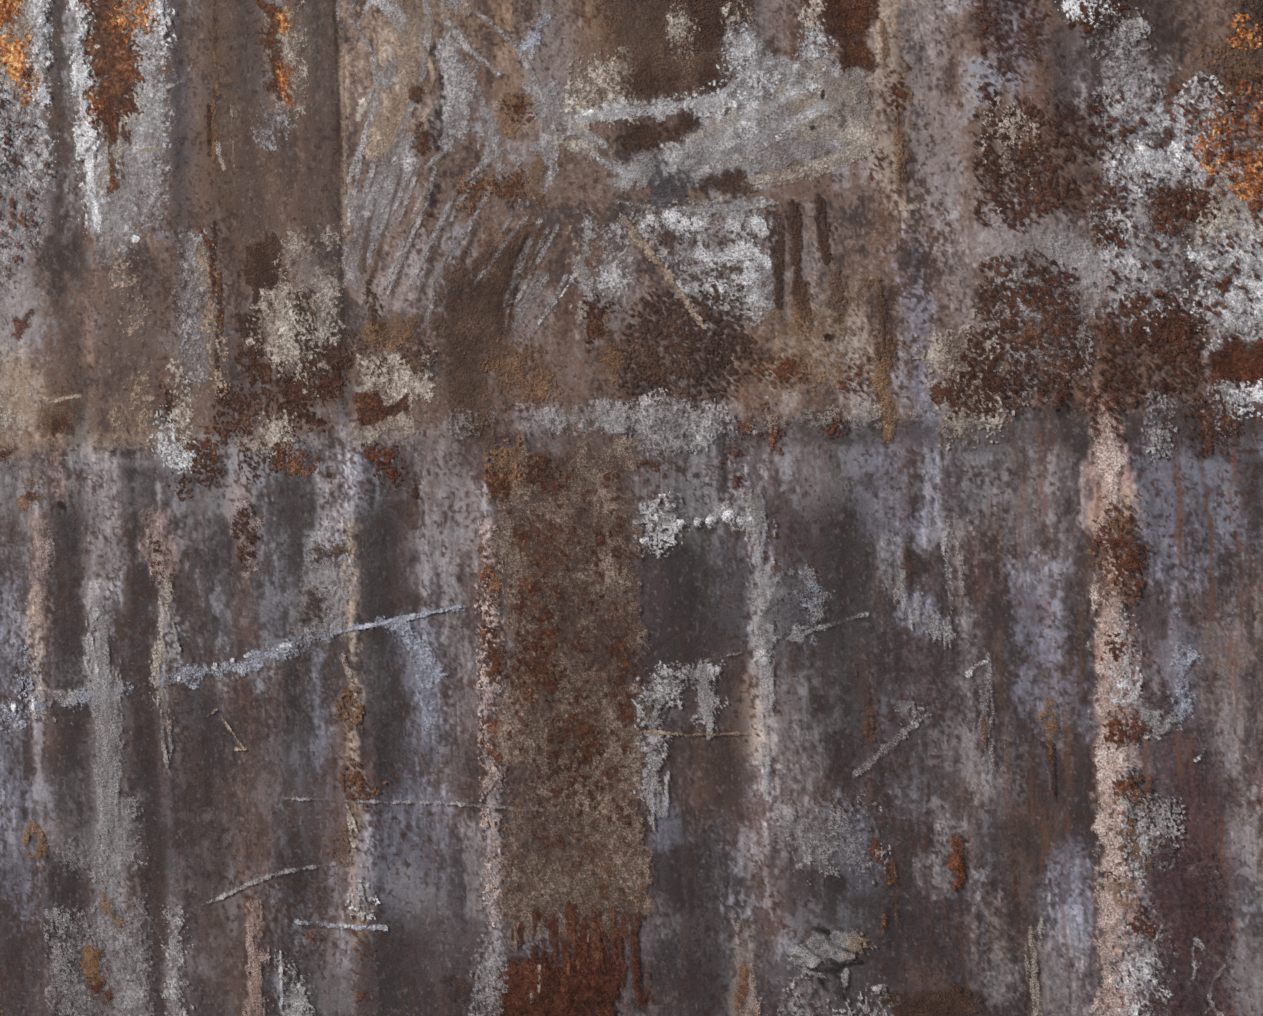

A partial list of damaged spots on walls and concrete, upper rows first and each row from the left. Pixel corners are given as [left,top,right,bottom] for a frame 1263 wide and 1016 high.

rust [0,0,58,277]
rust [75,0,162,197]
rust [254,0,294,109]
rust [453,155,578,216]
rust [497,87,537,138]
rust [579,0,757,209]
rust [803,0,913,190]
rust [929,0,1263,457]
rust [148,513,169,585]
rust [167,221,655,1016]